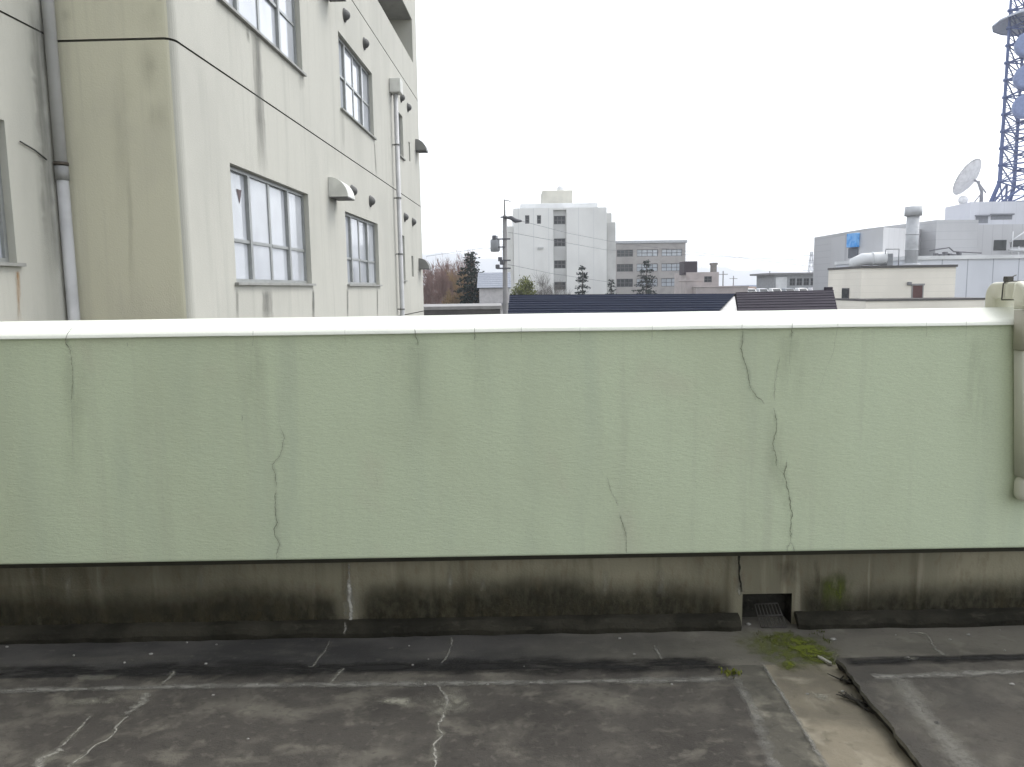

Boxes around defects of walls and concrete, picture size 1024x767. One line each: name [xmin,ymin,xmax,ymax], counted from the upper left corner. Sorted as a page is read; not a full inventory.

water stain [344,566,354,632]
crack [37,671,174,767]
crack [433,687,449,767]